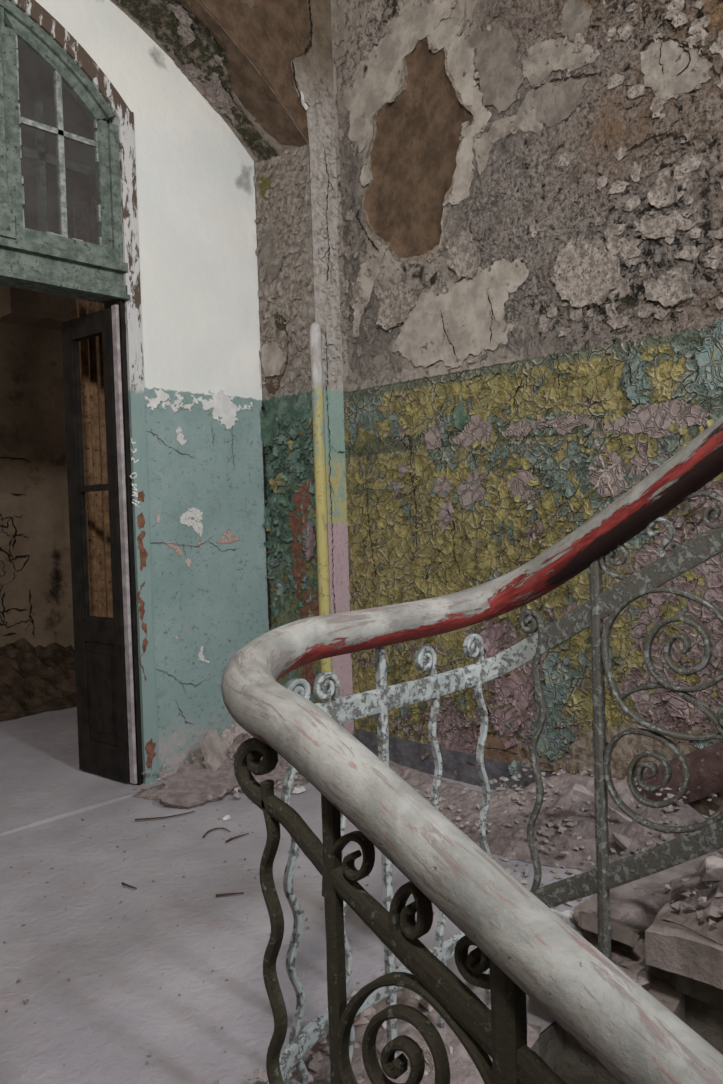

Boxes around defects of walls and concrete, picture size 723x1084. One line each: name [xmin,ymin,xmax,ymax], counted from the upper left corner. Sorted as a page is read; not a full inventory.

spalling [145,0,319,628]
spalling [334,0,723,609]
crack [0,493,35,637]
spalling [137,490,162,682]
crack [149,425,235,469]
crack [151,538,240,555]
crack [262,443,273,630]